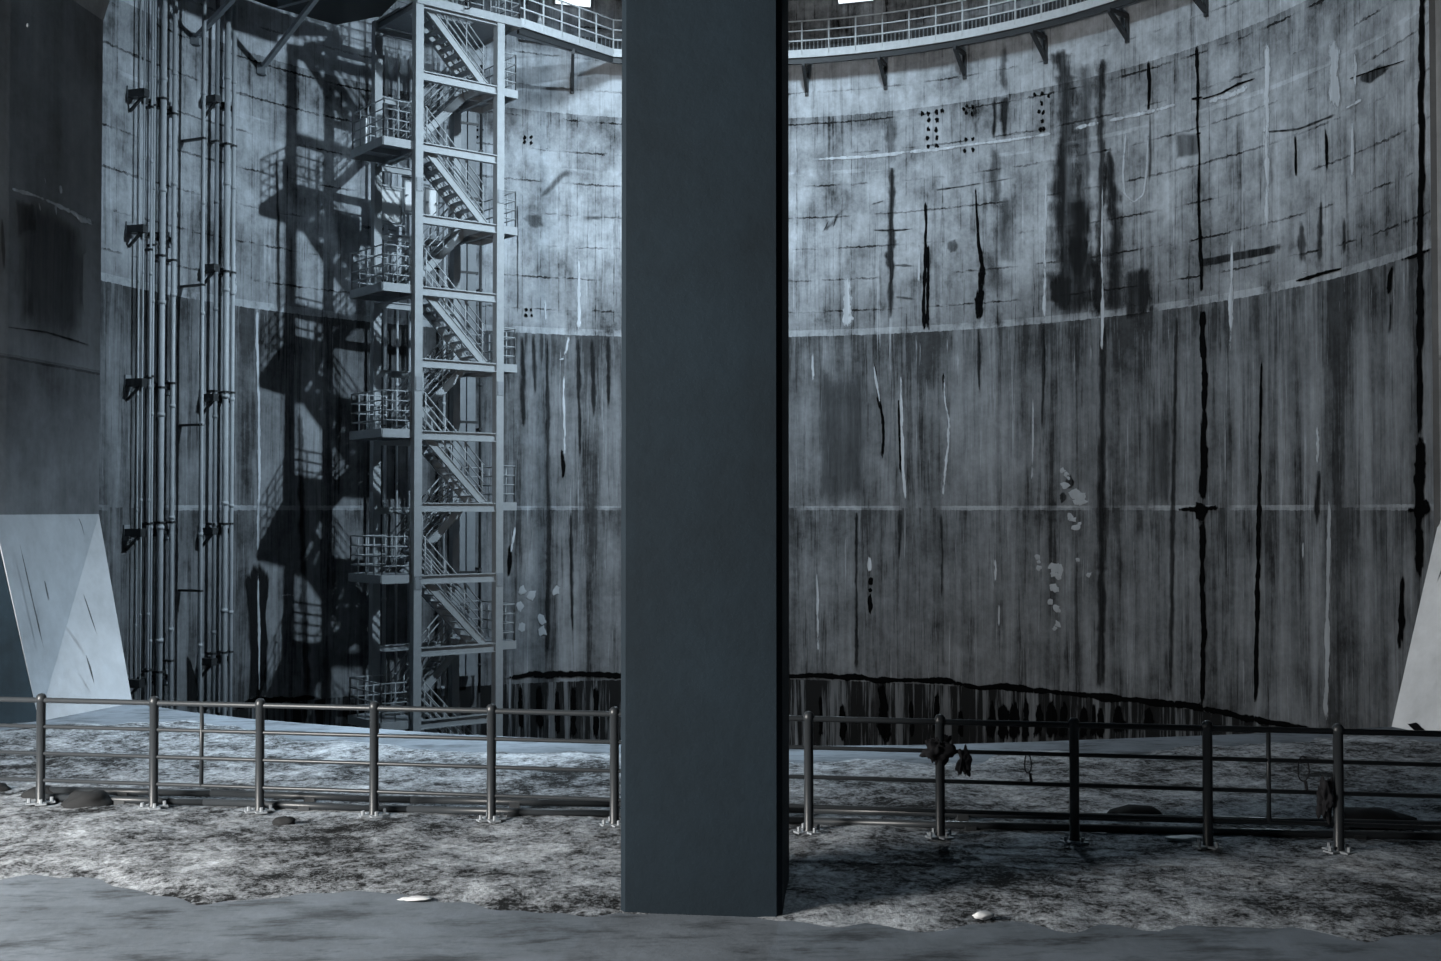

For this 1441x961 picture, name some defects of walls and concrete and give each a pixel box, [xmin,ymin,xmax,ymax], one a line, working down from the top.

crack [1144,61,1152,178]
damp [1298,203,1322,259]
crack [1265,0,1441,579]
damp [789,46,1309,743]
crack [1178,45,1253,709]
peeling [1060,467,1088,530]
peeling [516,585,560,637]
peeling [1034,554,1092,631]
damp [1314,427,1331,719]